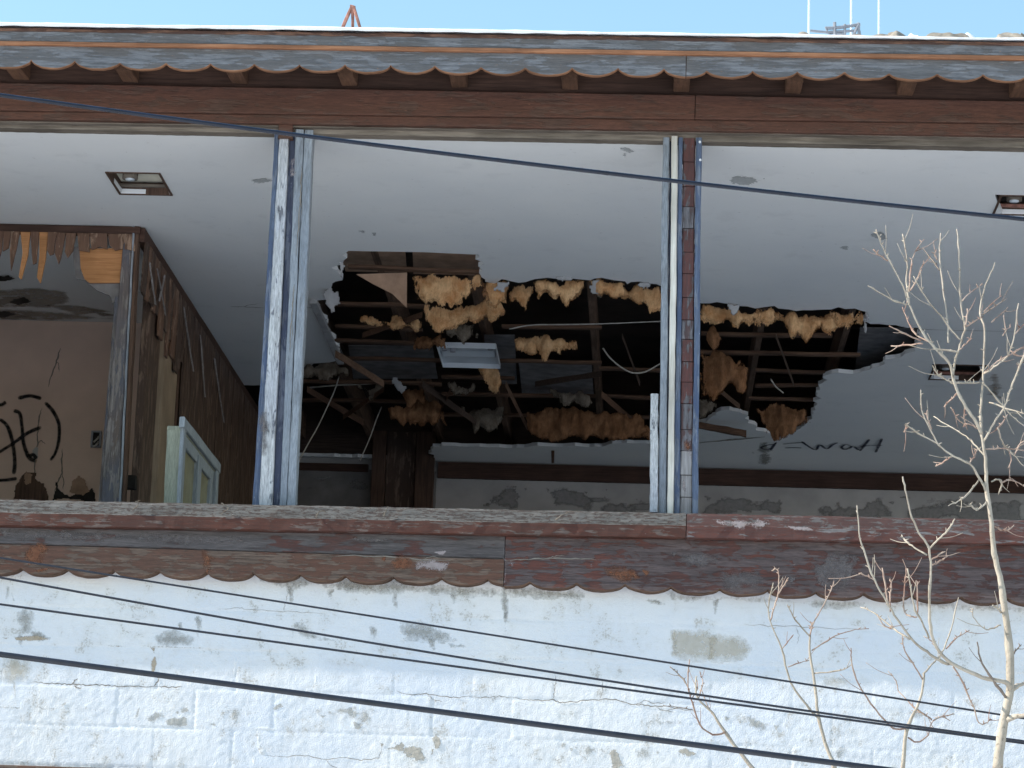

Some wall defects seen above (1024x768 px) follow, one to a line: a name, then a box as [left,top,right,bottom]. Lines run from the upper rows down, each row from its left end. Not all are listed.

flaking render [0,297,31,318]
flaking render [14,472,95,502]
flaking render [486,486,526,508]
flaking render [548,488,650,512]
flaking render [703,497,782,528]
flaking render [819,496,1023,520]
peeling [382,551,448,570]
crack [400,676,699,712]